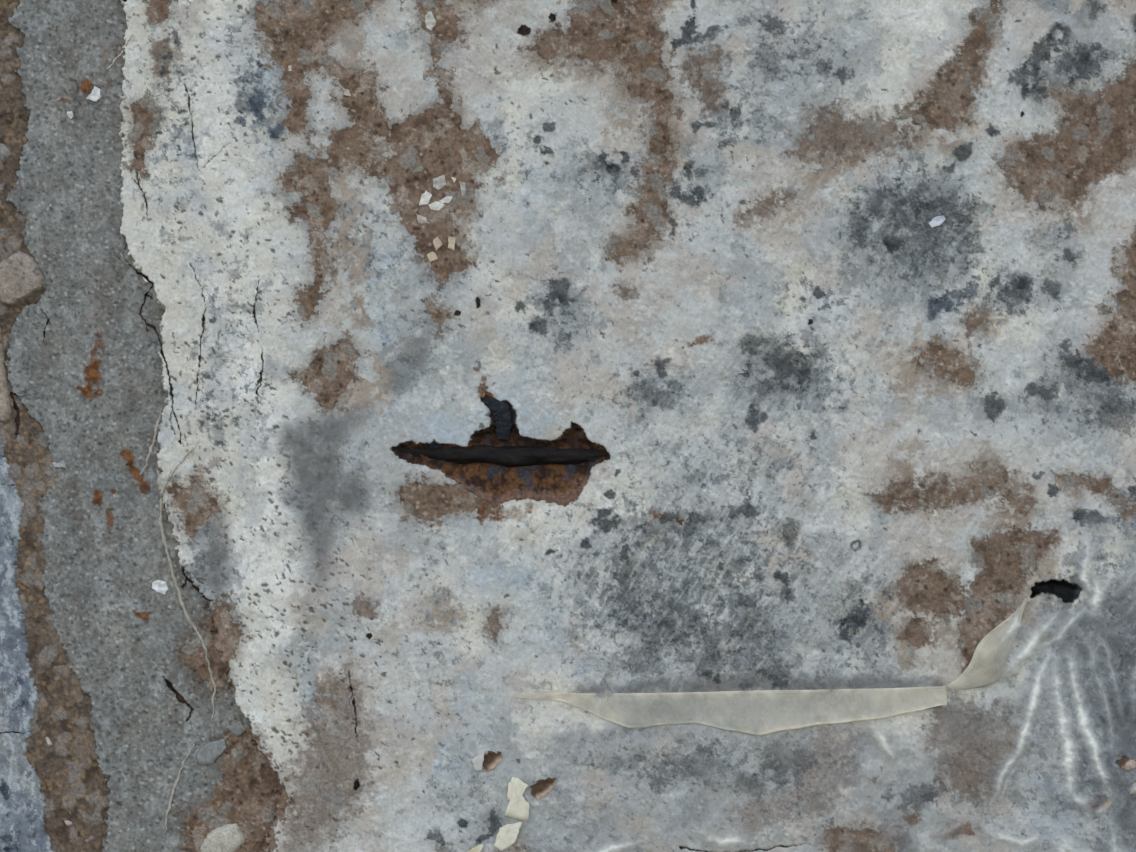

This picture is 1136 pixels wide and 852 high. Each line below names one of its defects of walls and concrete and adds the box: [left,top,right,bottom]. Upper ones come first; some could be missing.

peeling [86,86,101,102]
flaking render [122,0,180,180]
rust [77,343,103,401]
rust [92,490,117,526]
rust [120,449,150,494]
flaking render [159,469,230,544]
spalling [390,395,611,534]
flaking render [864,461,1062,686]
flaking render [168,595,250,705]
flaking render [171,688,369,852]
spalling [482,751,502,772]
spalling [531,778,557,801]